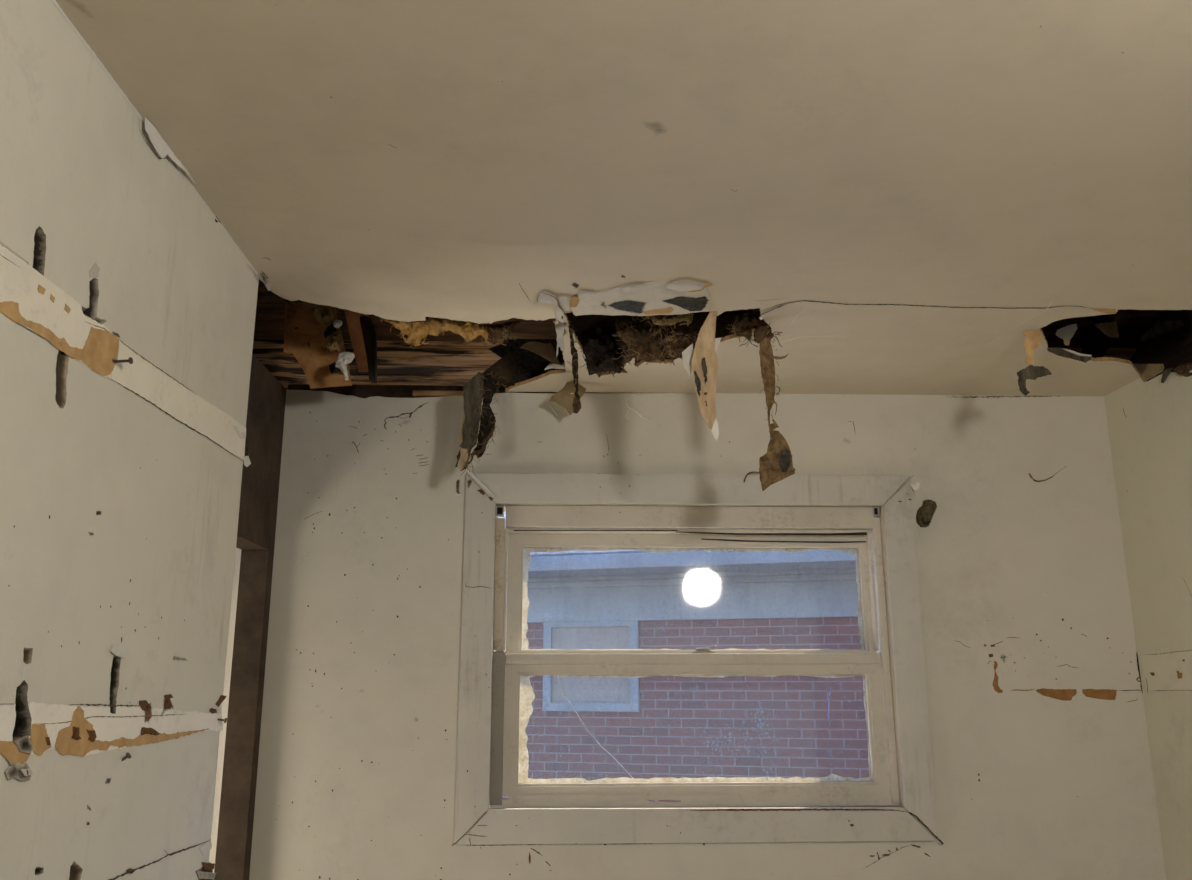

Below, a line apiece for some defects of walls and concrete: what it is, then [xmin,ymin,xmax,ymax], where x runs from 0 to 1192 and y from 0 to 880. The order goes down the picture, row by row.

peeling [0,226,119,409]
peeling [537,292,571,358]
spalling [1047,347,1091,363]
flaking render [1173,363,1192,377]
peeling [456,470,495,501]
spalling [23,647,33,664]
spalling [109,644,133,714]
peeling [984,644,1142,701]
peeling [0,680,209,781]